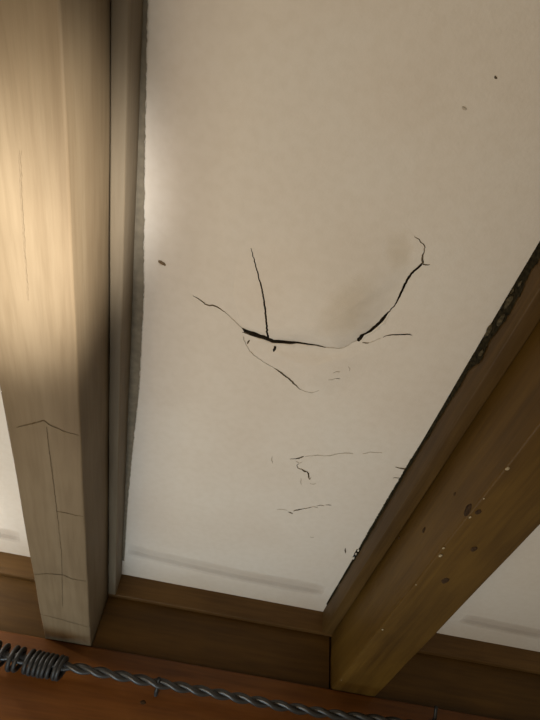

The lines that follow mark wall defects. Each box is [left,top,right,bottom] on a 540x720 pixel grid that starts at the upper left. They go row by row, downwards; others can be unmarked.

crack [193,236,426,393]
crack [296,452,380,485]